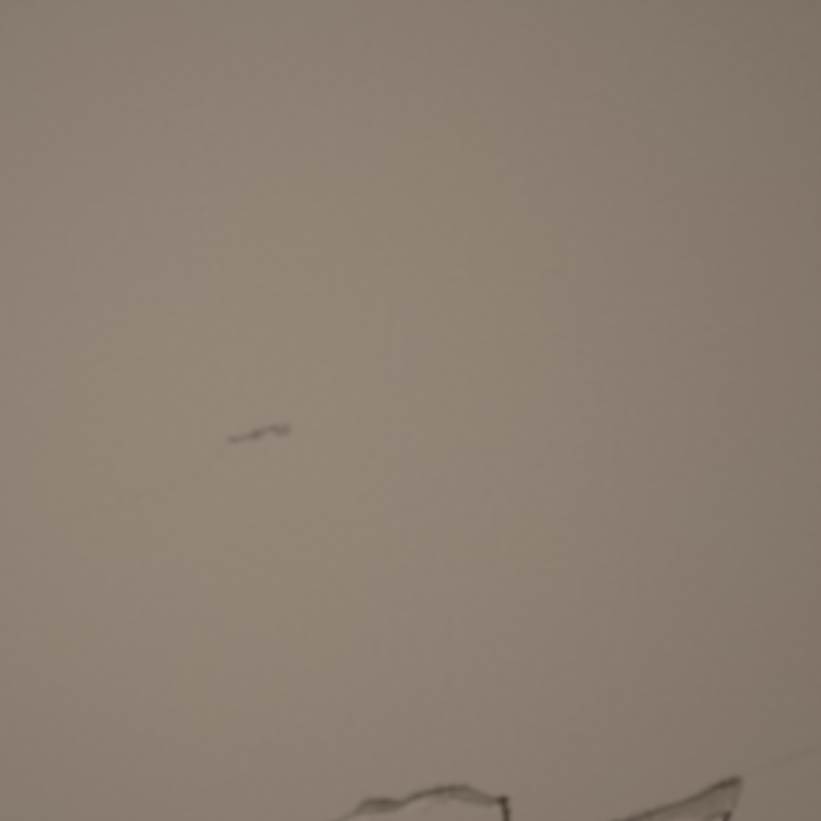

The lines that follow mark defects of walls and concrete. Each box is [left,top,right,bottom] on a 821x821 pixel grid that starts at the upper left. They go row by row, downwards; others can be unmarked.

peeling [347,796,509,821]